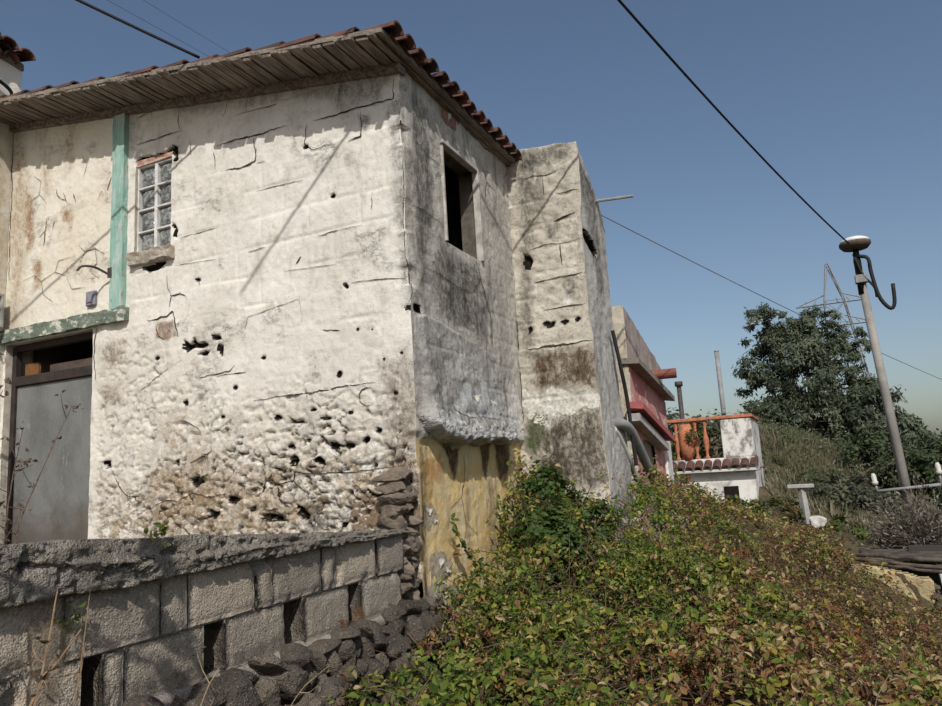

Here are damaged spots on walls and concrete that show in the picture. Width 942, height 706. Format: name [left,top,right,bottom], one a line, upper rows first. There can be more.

crack [137,79,394,170]
crack [465,127,582,283]
crack [147,259,214,339]
crack [254,382,376,406]
water stain [536,351,595,386]
water stain [443,444,459,478]
water stain [540,410,609,486]
hole [228,496,286,523]
hole [297,505,311,520]
peeling [422,502,439,531]
water stain [480,443,511,551]
peeling [426,551,473,621]